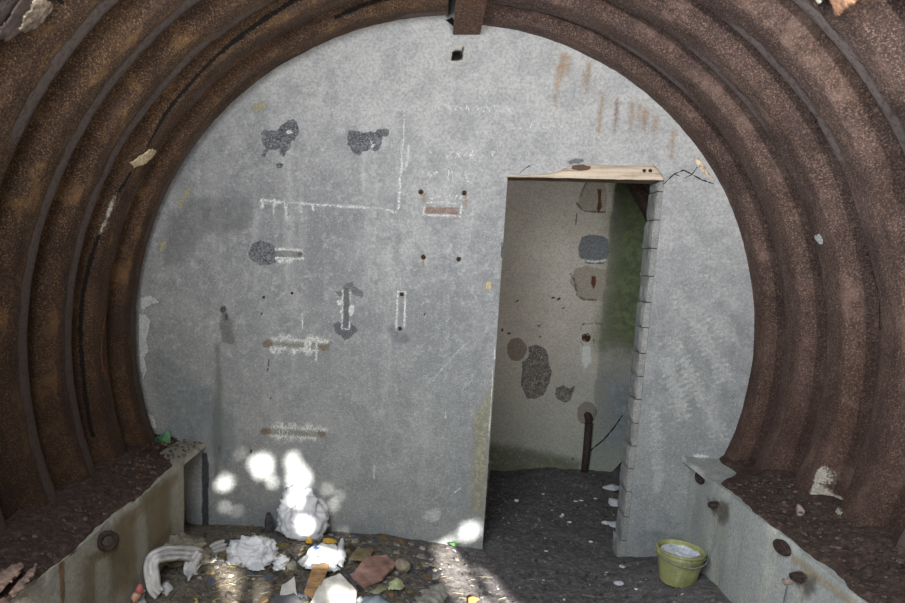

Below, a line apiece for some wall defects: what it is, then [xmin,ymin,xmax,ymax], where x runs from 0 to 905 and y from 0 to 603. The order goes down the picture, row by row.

spalling [261,119,299,169]
spalling [347,128,389,155]
crack [664,167,714,184]
spalling [249,240,304,265]
spalling [521,345,575,402]